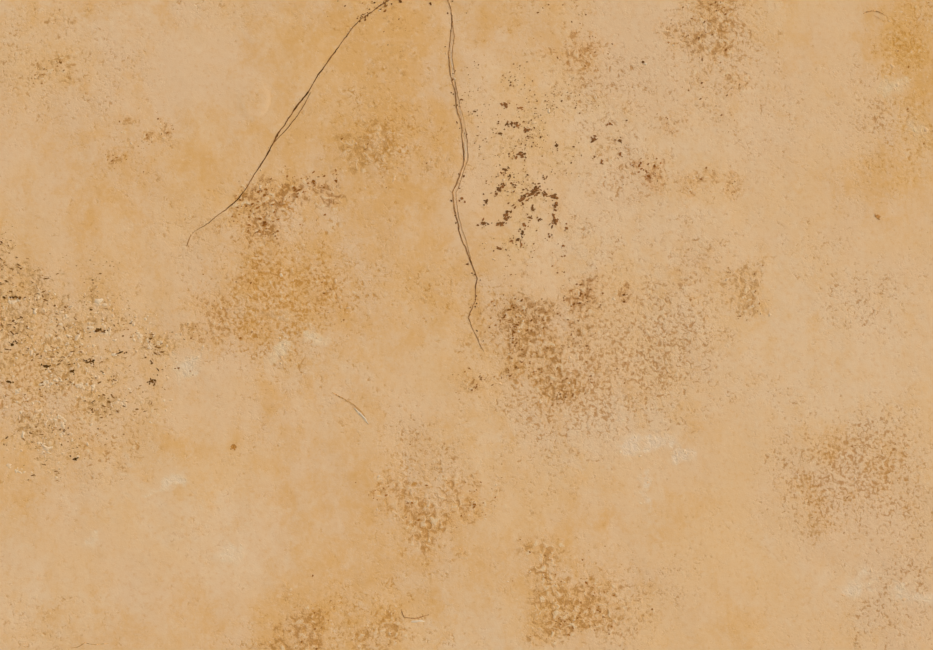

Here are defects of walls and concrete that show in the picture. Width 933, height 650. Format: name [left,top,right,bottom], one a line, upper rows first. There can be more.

crack [187,0,402,245]
crack [429,0,484,351]